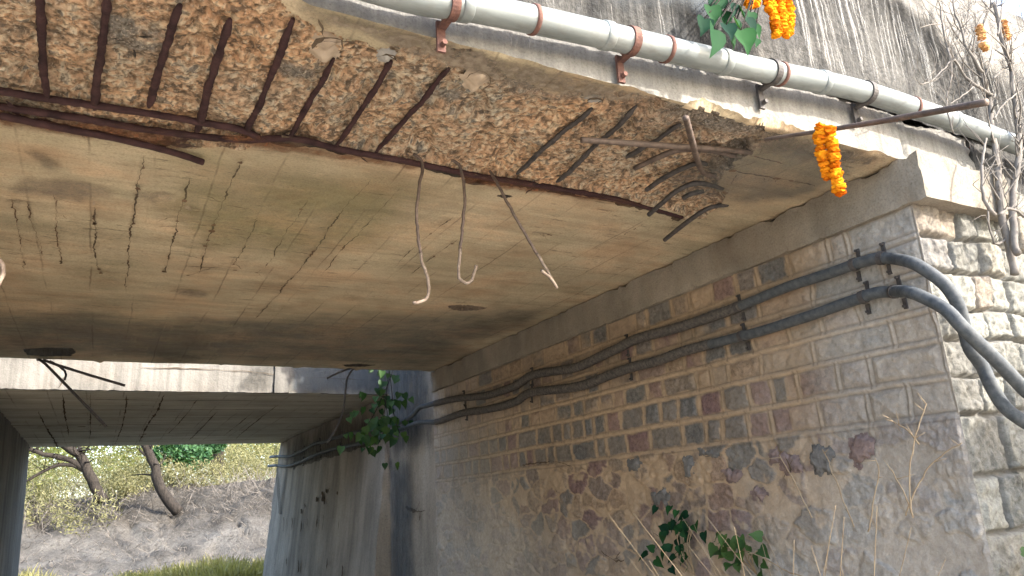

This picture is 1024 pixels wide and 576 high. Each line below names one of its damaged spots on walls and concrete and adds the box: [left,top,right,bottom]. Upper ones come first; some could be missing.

crack [6,101,101,132]
corrosion [0,120,177,149]
corrosion [227,135,386,165]
spalling [0,0,815,304]
spalling [836,98,989,131]
crack [9,135,575,317]
crack [597,200,681,248]
crack [38,377,278,450]